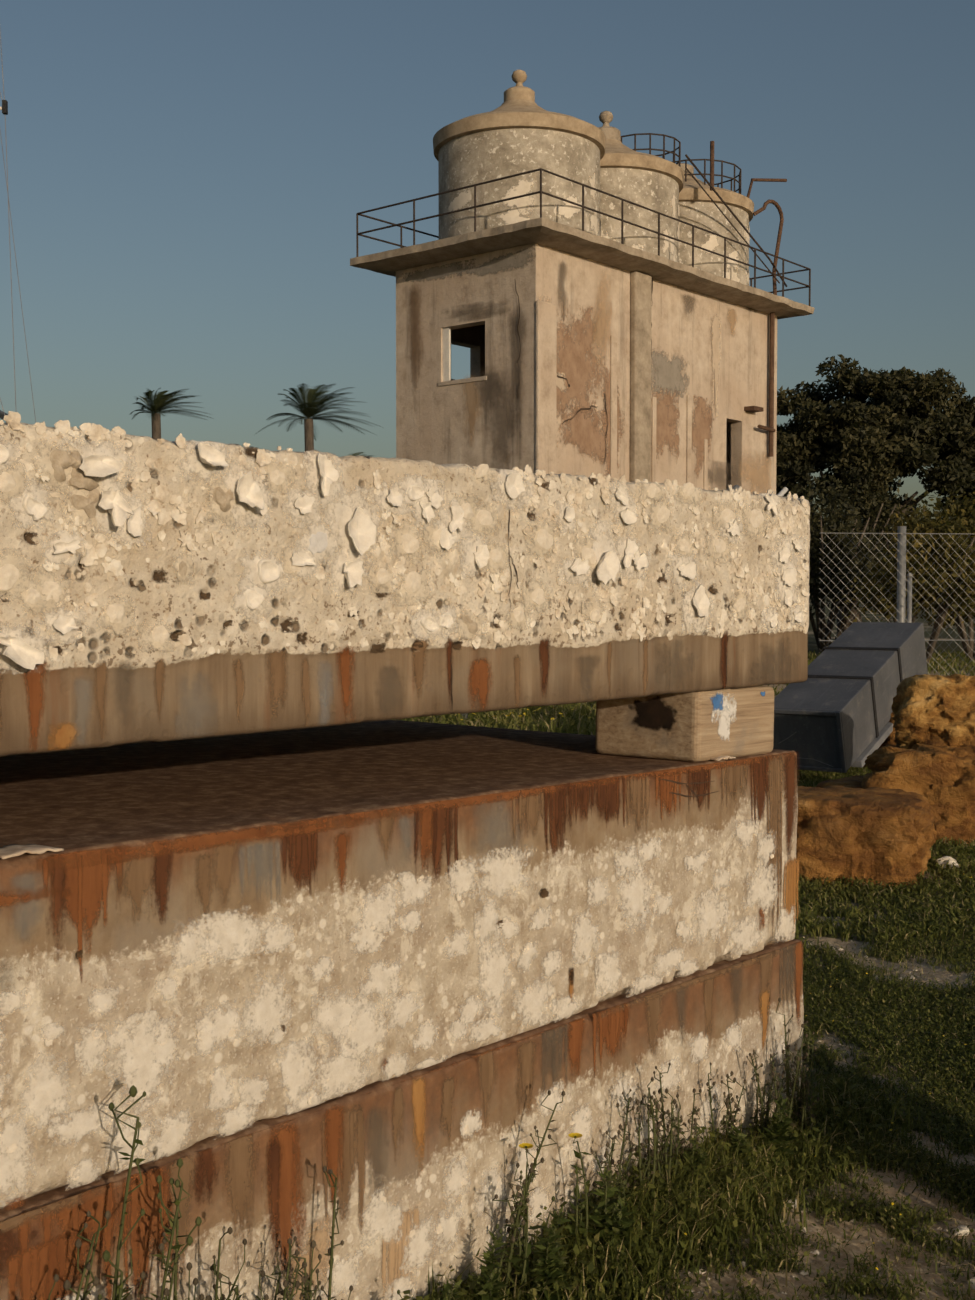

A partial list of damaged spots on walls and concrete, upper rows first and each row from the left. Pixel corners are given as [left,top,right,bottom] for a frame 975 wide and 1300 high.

peeling [180,305,807,651]
peeling [0,437,179,674]
corrosion [24,663,77,750]
corrosion [337,648,355,715]
spalling [370,643,386,653]
corrosion [539,638,550,692]
corrosion [720,633,729,689]
corrosion [0,752,803,1048]
corrosion [412,1003,629,1161]
corrosion [0,1143,225,1300]
corrosion [267,1119,306,1271]
corrosion [322,1106,366,1231]